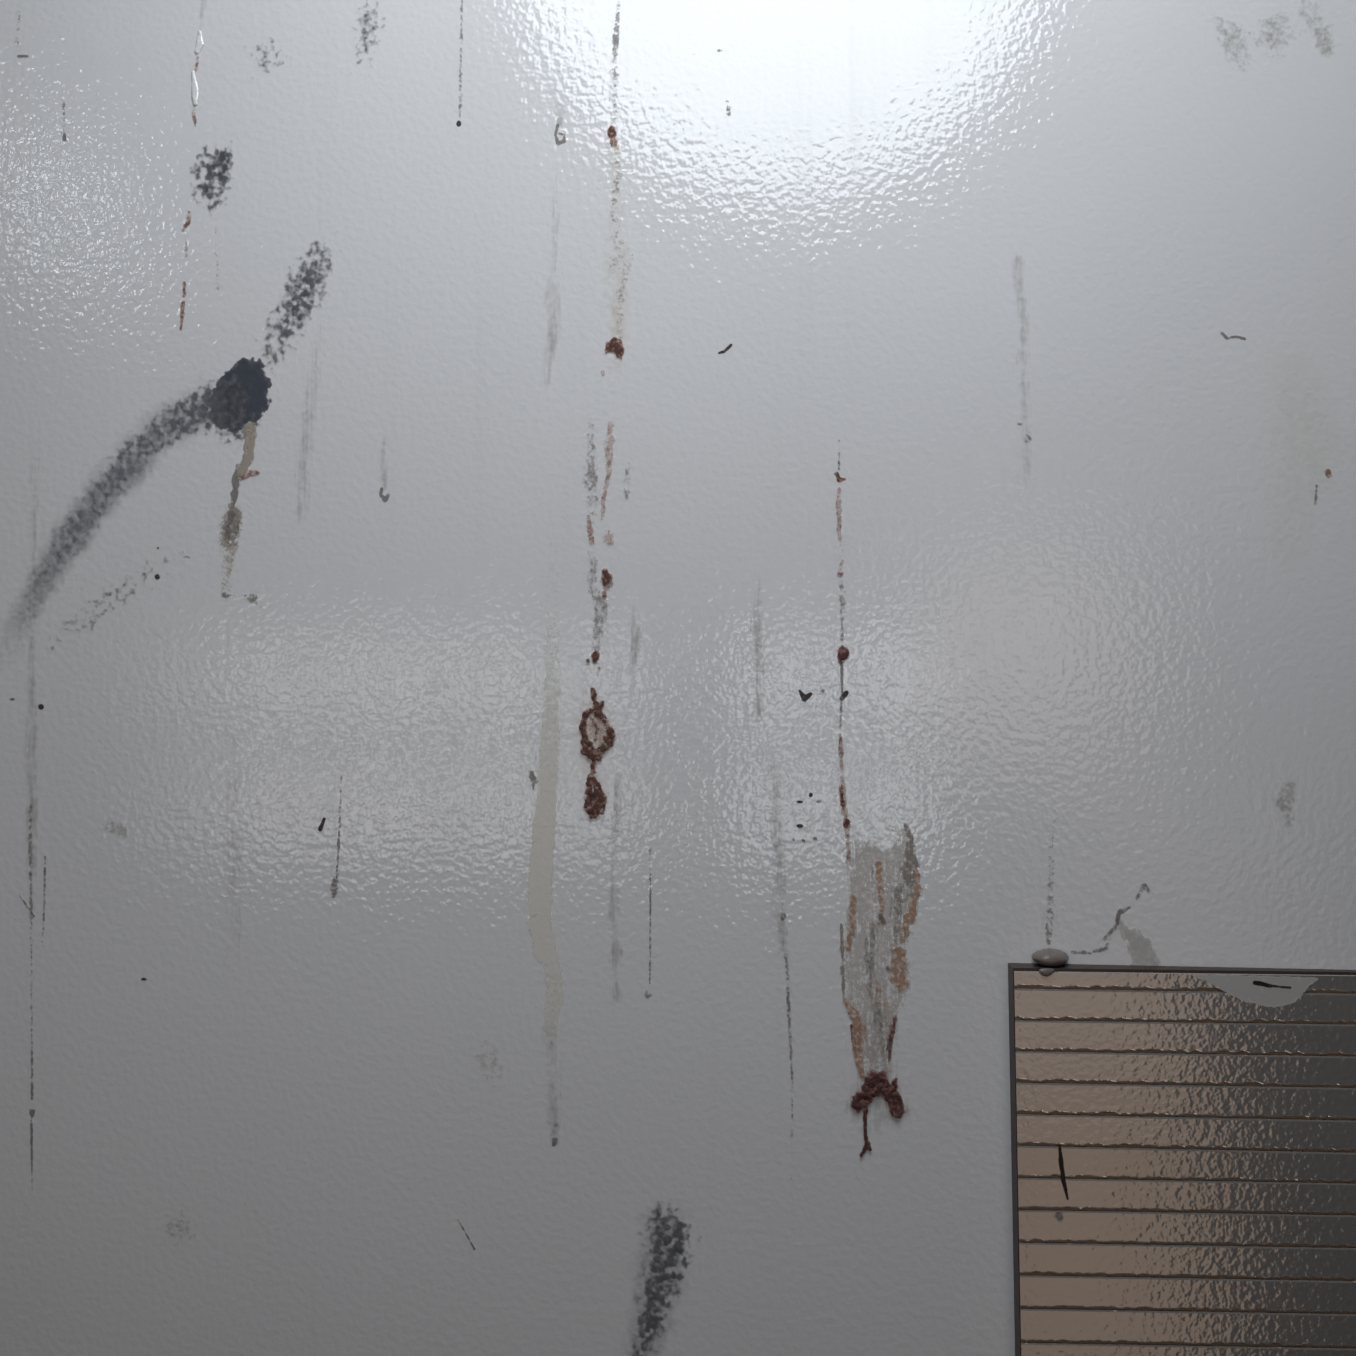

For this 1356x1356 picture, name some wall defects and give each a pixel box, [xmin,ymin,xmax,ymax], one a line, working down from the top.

corrosion [612,12,620,86]
corrosion [607,126,617,146]
corrosion [605,337,624,360]
damp [220,421,260,604]
corrosion [584,422,628,544]
corrosion [834,460,846,540]
corrosion [586,560,613,670]
corrosion [579,688,615,819]
corrosion [837,560,851,860]
damp [527,667,563,1031]
peeling [840,824,922,1157]